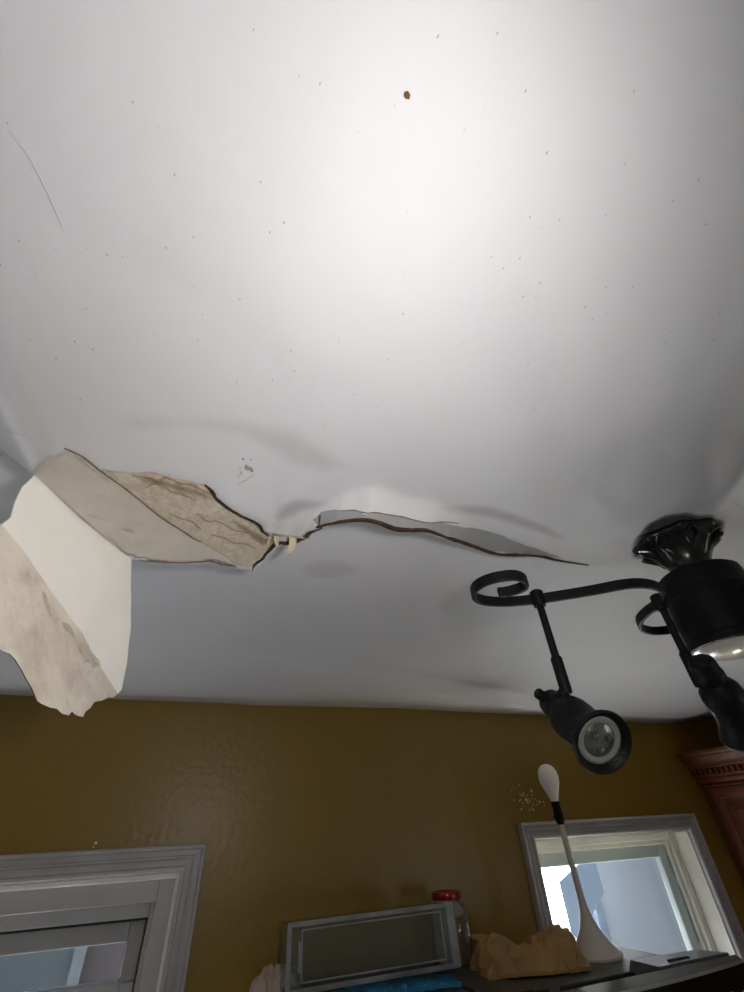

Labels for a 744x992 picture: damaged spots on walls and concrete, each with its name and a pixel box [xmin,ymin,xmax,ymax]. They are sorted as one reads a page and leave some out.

flaking render [102,469,311,567]
crack [64,447,589,571]
peeling [0,475,132,717]